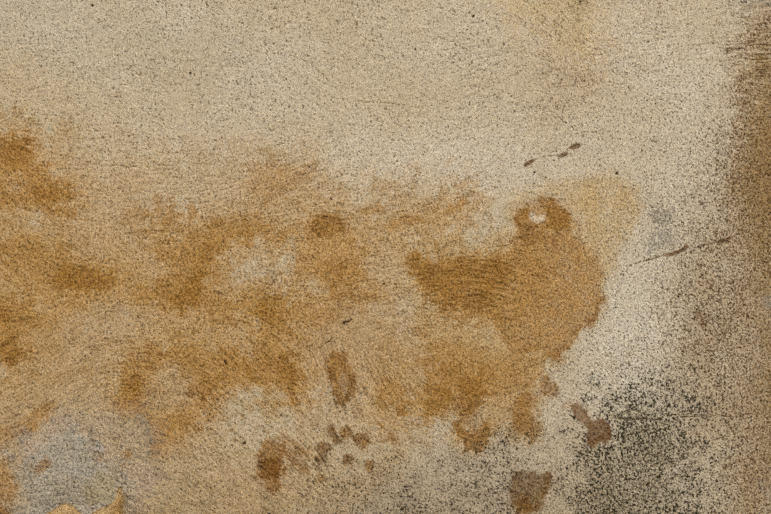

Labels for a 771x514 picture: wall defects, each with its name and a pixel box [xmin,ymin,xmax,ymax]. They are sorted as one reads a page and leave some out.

crack [523,106,582,168]
water stain [0,88,742,514]
crack [627,236,735,267]
peeling [0,368,199,514]